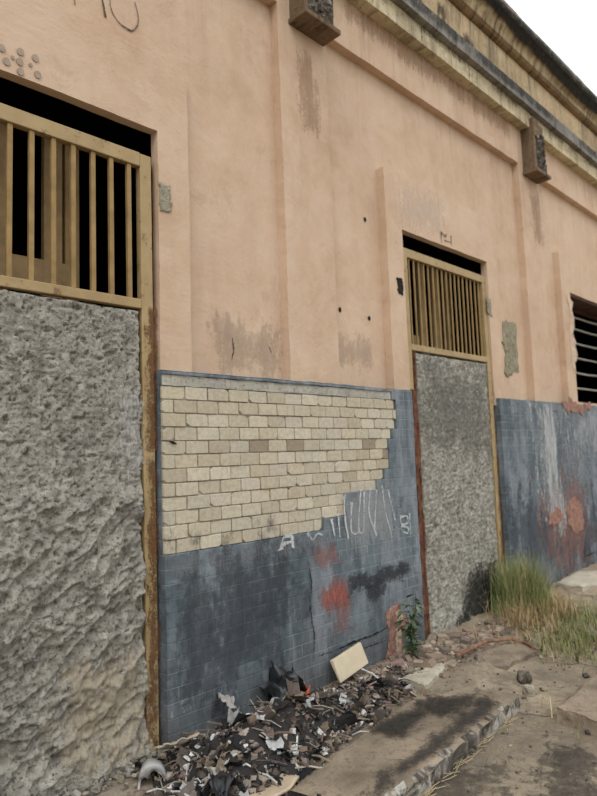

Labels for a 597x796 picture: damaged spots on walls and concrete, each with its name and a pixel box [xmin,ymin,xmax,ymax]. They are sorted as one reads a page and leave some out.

water stain [411,0,552,119]
water stain [483,0,597,114]
spalling [562,396,591,416]
spalling [548,497,584,534]